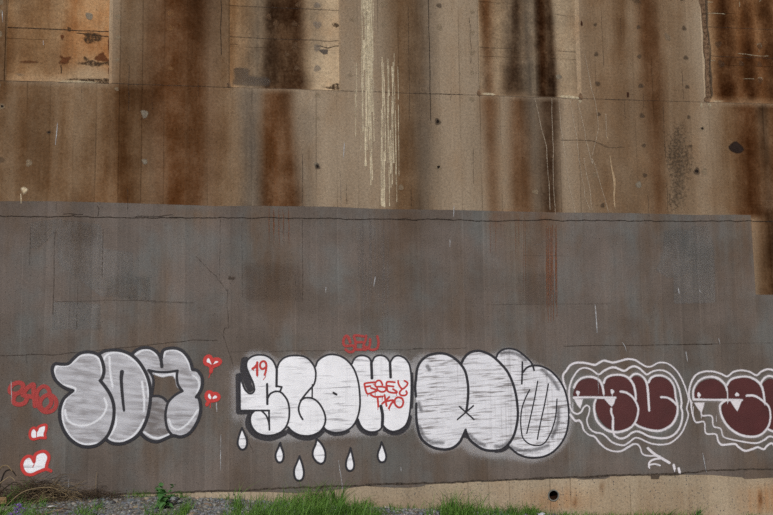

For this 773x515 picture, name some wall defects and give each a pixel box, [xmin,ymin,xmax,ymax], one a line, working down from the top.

rust [510,0,519,89]
rust [543,101,557,212]